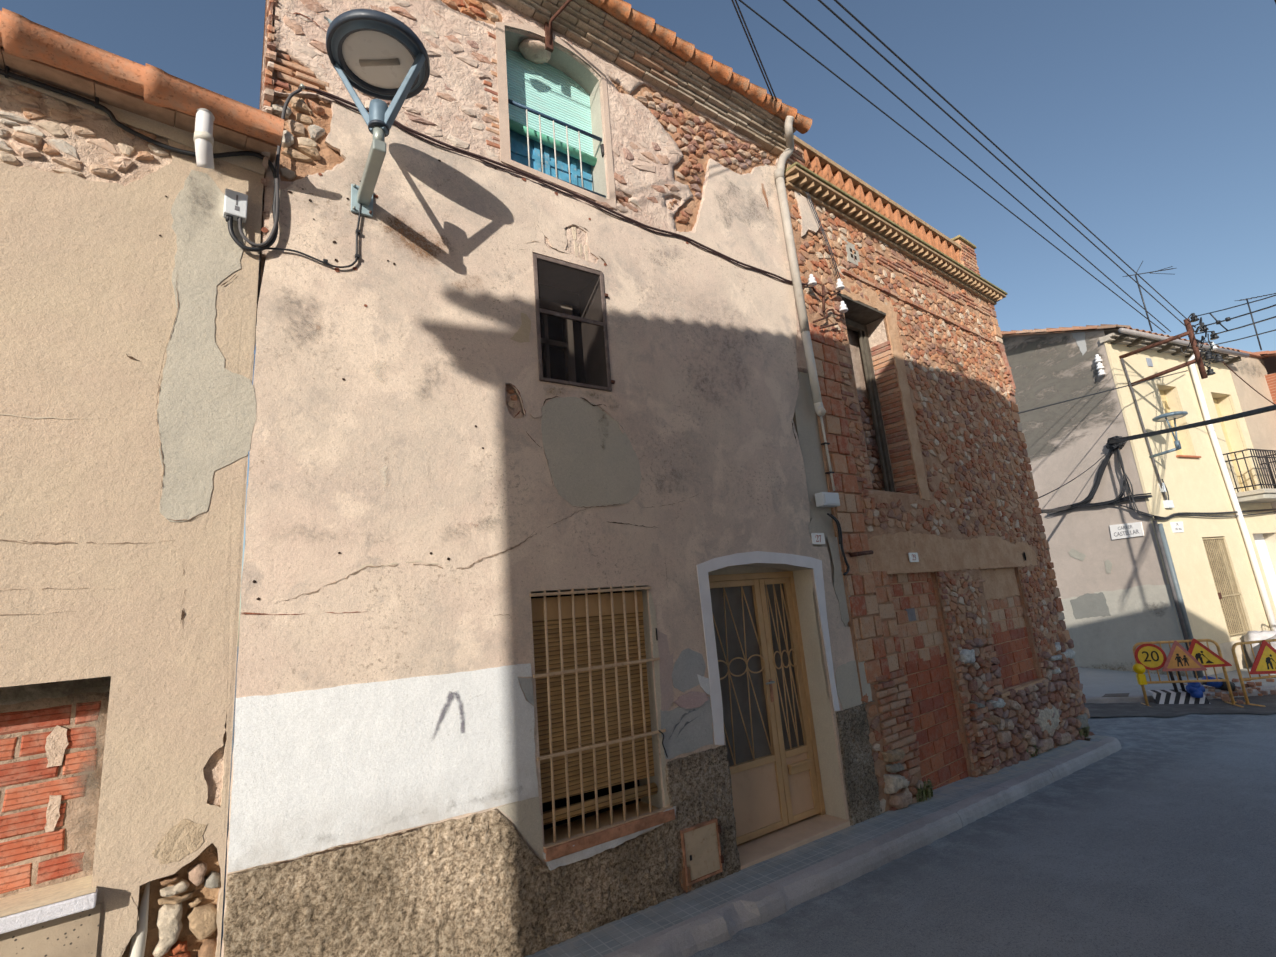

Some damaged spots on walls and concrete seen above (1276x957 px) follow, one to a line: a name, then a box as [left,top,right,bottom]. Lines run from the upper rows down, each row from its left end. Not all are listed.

flaking render [441,0,503,25]
flaking render [0,78,172,186]
flaking render [270,50,345,182]
flaking render [612,82,777,232]
crack [0,274,203,544]
flaking render [505,384,526,419]
crack [542,396,625,431]
crack [239,493,702,615]
leakage [0,676,111,705]
spalling [100,843,221,957]